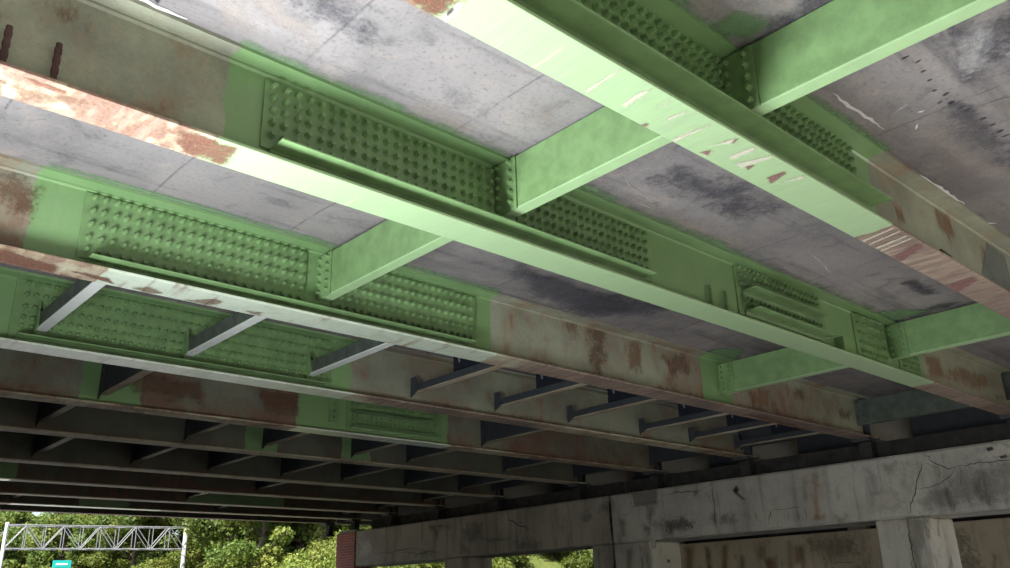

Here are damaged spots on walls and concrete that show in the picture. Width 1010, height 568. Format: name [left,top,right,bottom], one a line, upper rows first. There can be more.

rust [415,0,453,15]
rust [15,78,82,103]
rust [177,131,236,165]
rust [0,250,57,274]
rust [260,391,298,415]
crack [906,453,1010,568]